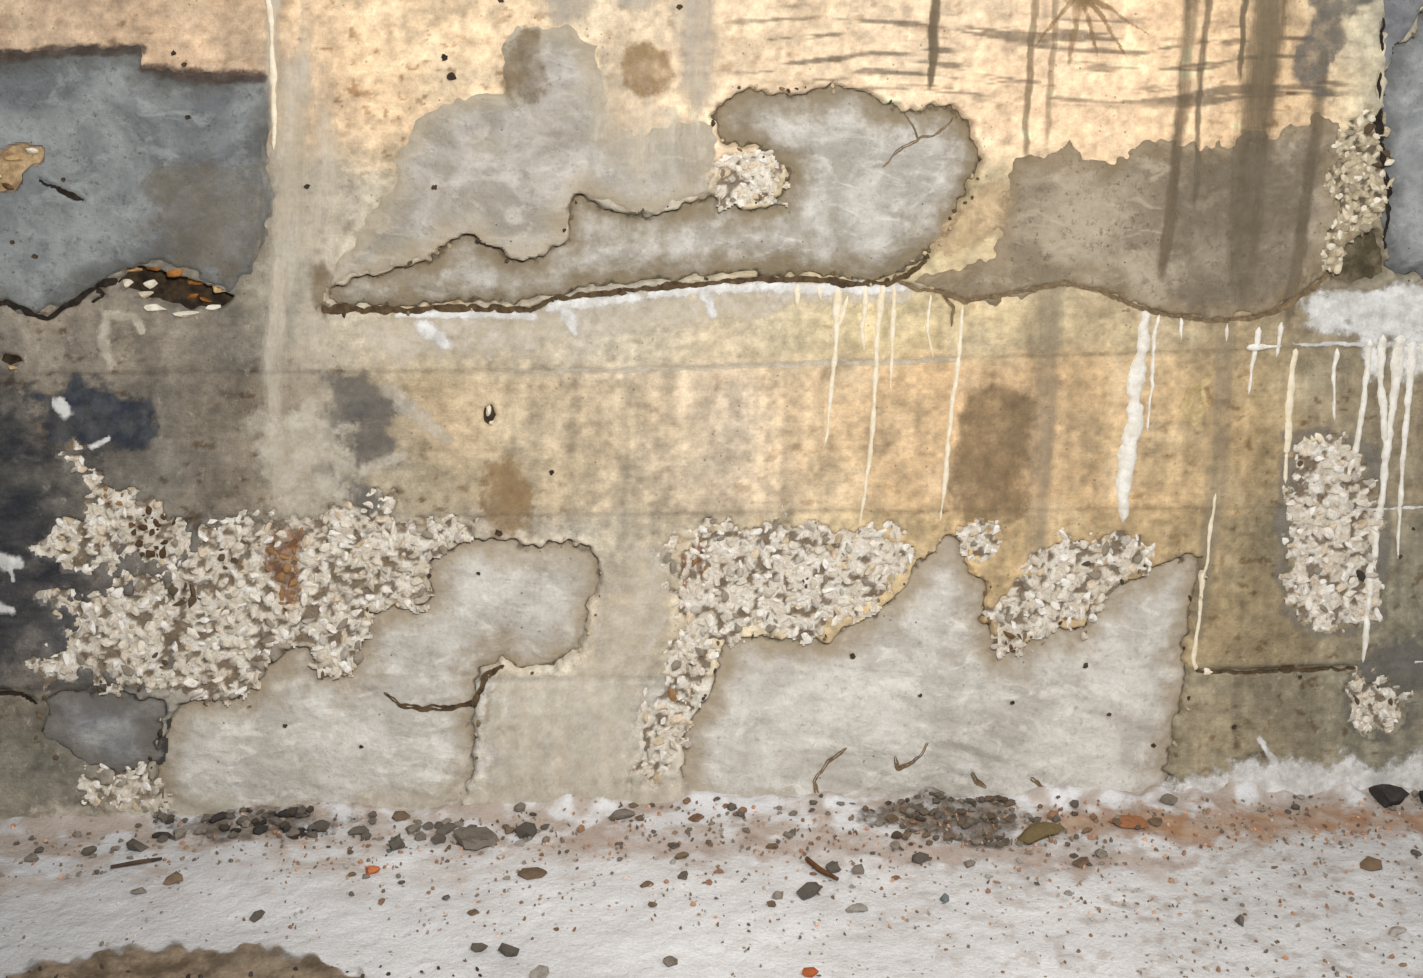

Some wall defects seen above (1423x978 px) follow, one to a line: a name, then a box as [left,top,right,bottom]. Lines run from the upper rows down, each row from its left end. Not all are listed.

leakage [0,373,159,648]
peeling [0,45,275,318]
spalling [25,439,479,708]
crack [383,665,504,712]
leakage [0,0,1033,526]
peeling [330,24,790,286]
spalling [627,505,916,794]
leakage [1116,311,1160,522]
peeling [914,104,1395,319]
leakage [1162,736,1423,796]
leakage [1232,0,1423,741]
spalling [1278,432,1385,633]